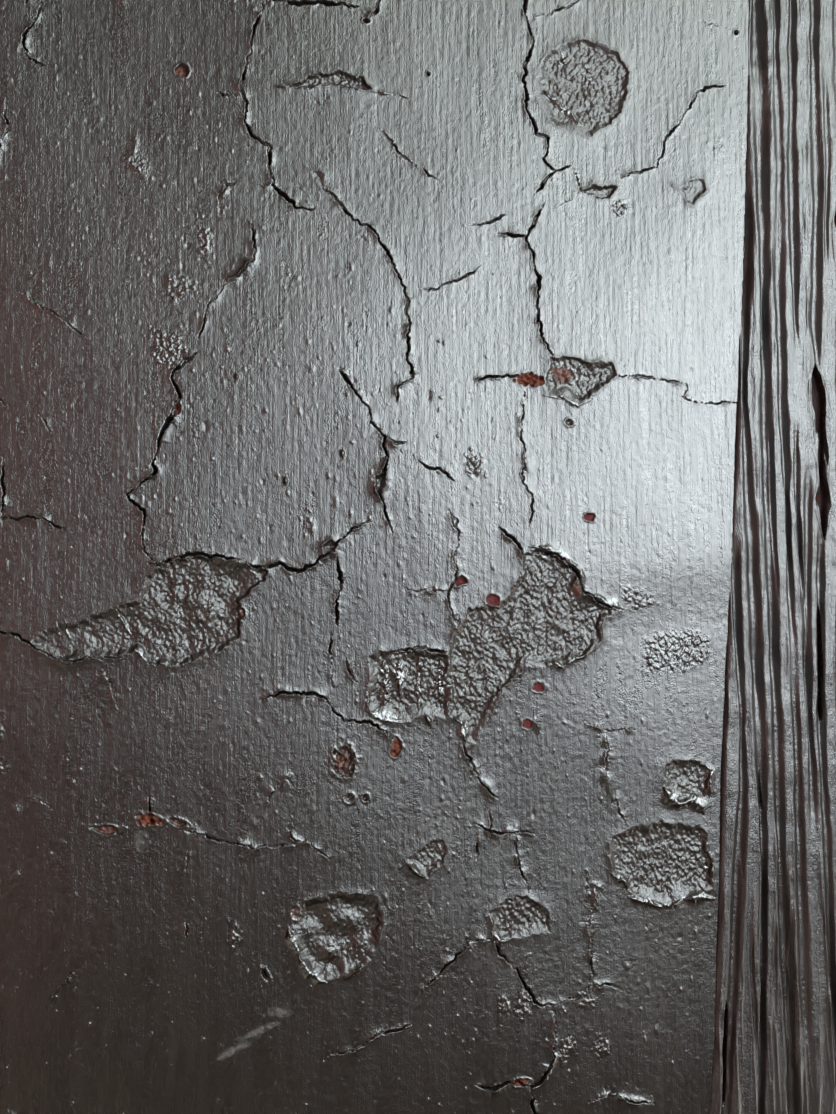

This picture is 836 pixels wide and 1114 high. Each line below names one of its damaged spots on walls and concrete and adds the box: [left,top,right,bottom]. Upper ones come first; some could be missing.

crack [468,0,584,354]
crack [211,0,485,656]
corrosion [510,360,581,393]
peeling [541,353,620,429]
crack [123,220,394,740]
crack [471,372,626,613]
corrosion [453,575,469,589]
corrosion [484,592,502,609]
peeling [362,647,449,727]
corrosion [531,680,548,694]
peeling [605,757,716,909]
peeling [285,888,387,984]